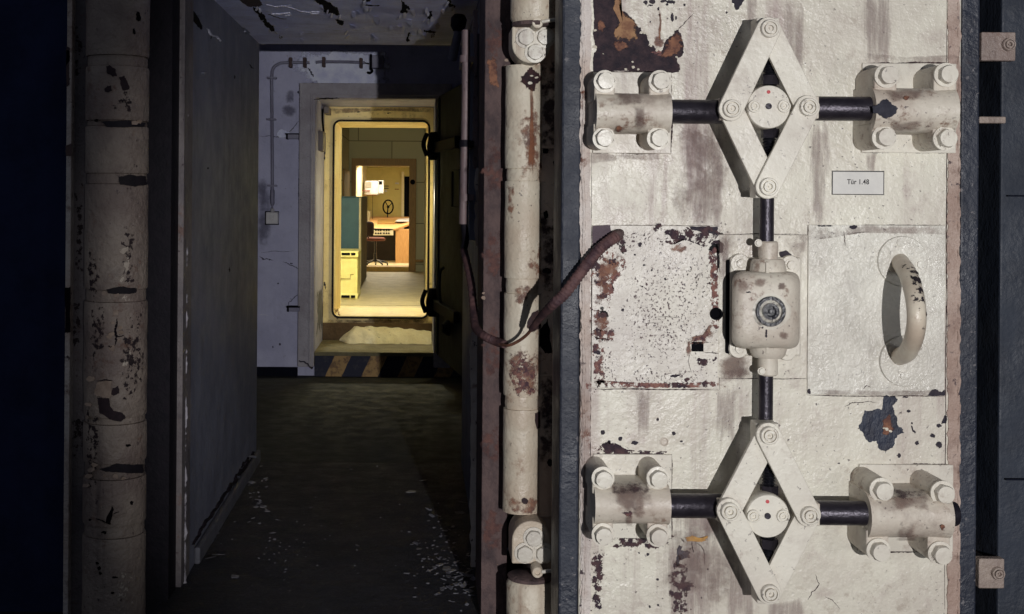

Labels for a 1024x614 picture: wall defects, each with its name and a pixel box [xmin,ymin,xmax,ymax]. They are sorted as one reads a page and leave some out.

peeling [240,0,282,39]
flaking render [294,0,390,83]
corrosion [593,0,684,73]
peeling [104,65,142,125]
corrosion [521,94,542,170]
corrosion [590,251,627,342]
corrosion [484,329,538,396]
corrosion [686,325,712,353]
peeling [72,313,144,487]
peeling [859,395,947,458]